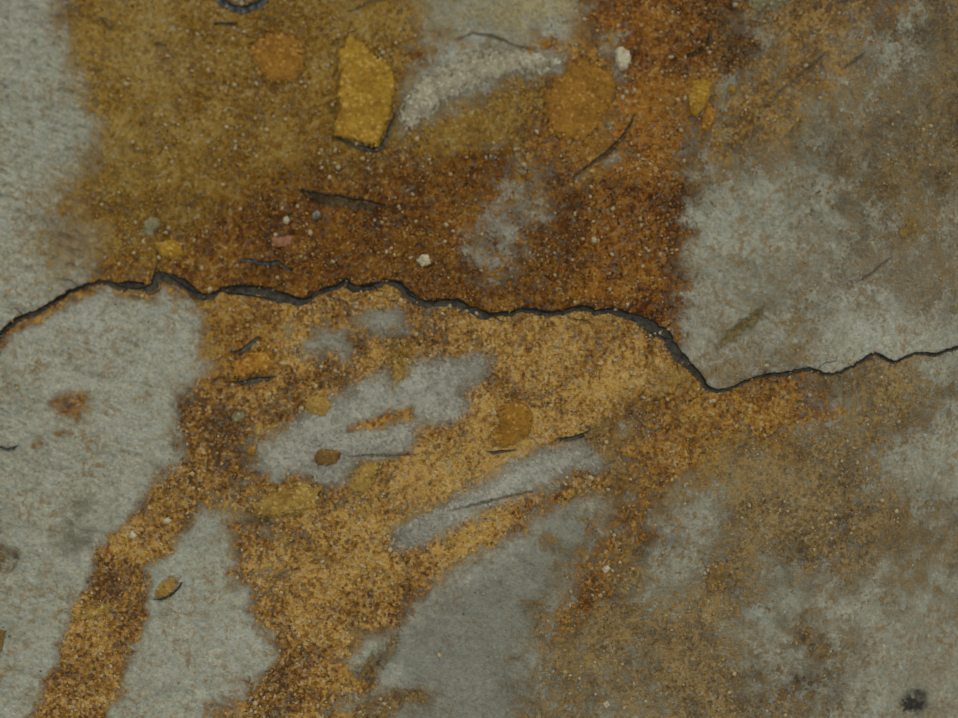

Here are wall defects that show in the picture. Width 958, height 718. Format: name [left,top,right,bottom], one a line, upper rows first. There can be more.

crack [0,258,958,403]
corrosion [29,284,958,718]
corrosion [62,0,958,344]